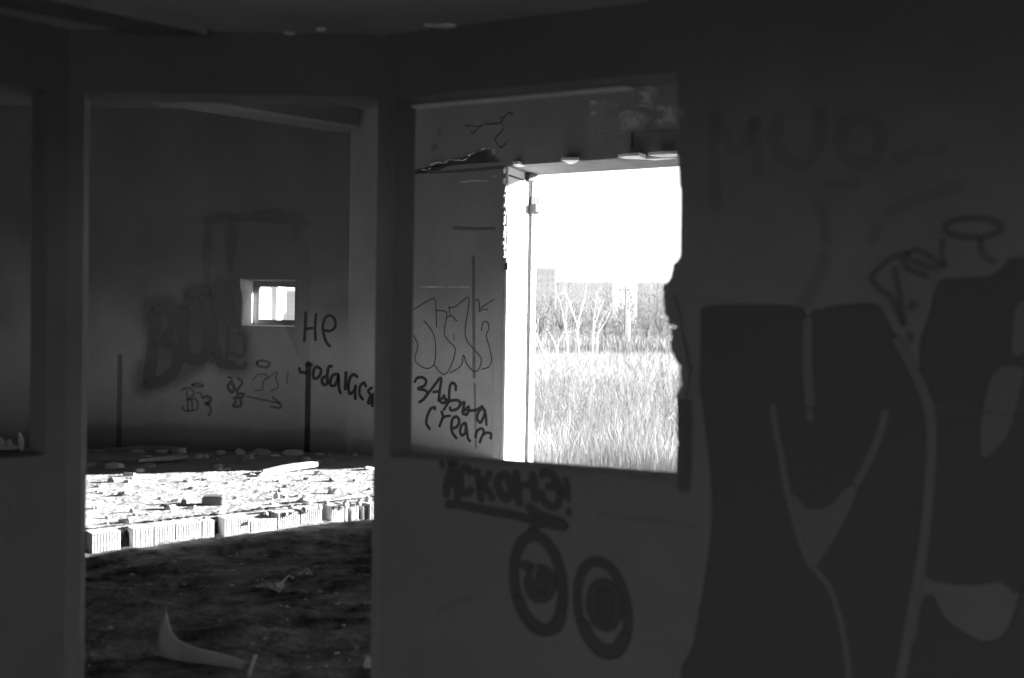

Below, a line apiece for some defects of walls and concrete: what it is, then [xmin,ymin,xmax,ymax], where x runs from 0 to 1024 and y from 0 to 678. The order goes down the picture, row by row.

crack [466,112,513,149]
spalling [415,148,525,458]
spalling [663,253,702,400]